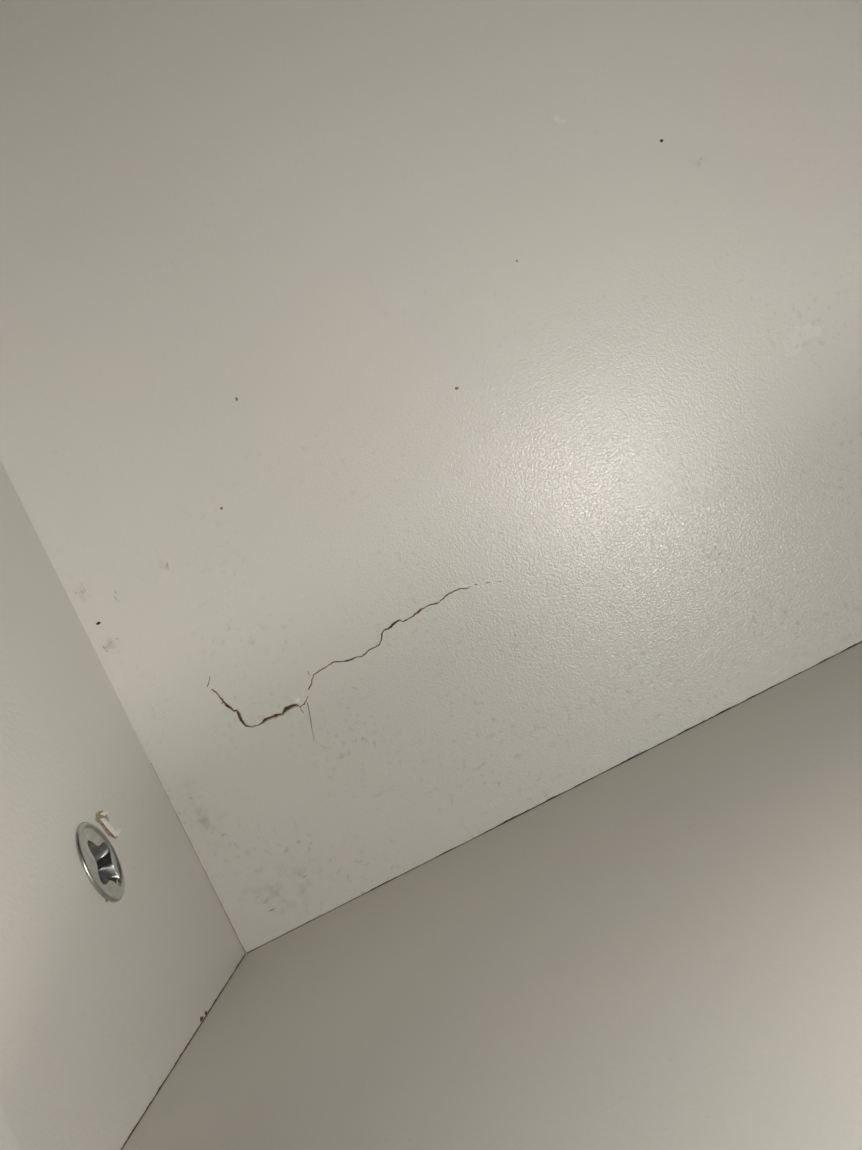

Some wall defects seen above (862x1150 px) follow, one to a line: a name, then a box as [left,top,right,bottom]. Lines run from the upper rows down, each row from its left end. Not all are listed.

crack [207,581,500,738]
crack [121,641,862,1150]